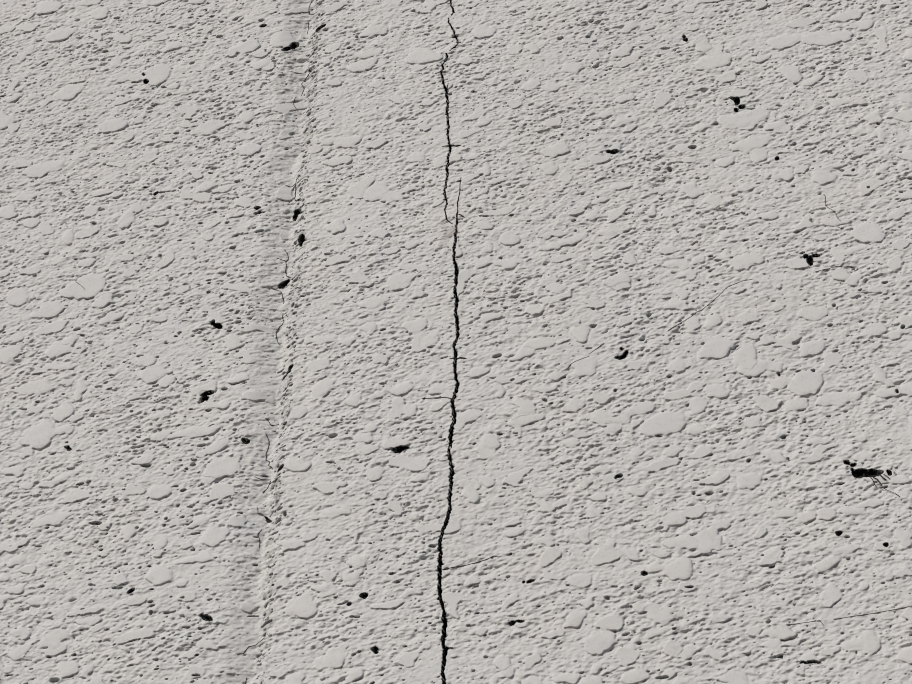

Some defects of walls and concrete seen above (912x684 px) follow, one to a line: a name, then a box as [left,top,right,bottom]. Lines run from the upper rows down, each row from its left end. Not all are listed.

crack [421,0,493,684]